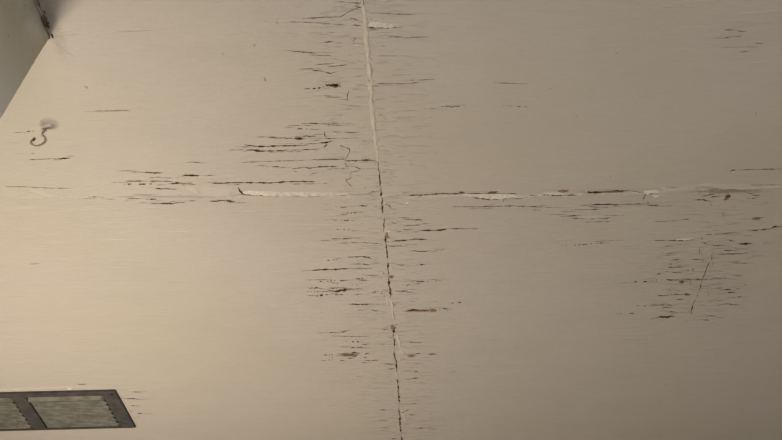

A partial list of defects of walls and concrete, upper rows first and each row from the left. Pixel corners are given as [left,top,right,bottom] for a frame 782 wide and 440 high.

crack [119,123,461,311]
peeling [462,189,574,201]
crack [407,191,688,245]
peeling [584,190,660,200]
crack [617,215,782,320]
crack [330,327,426,440]